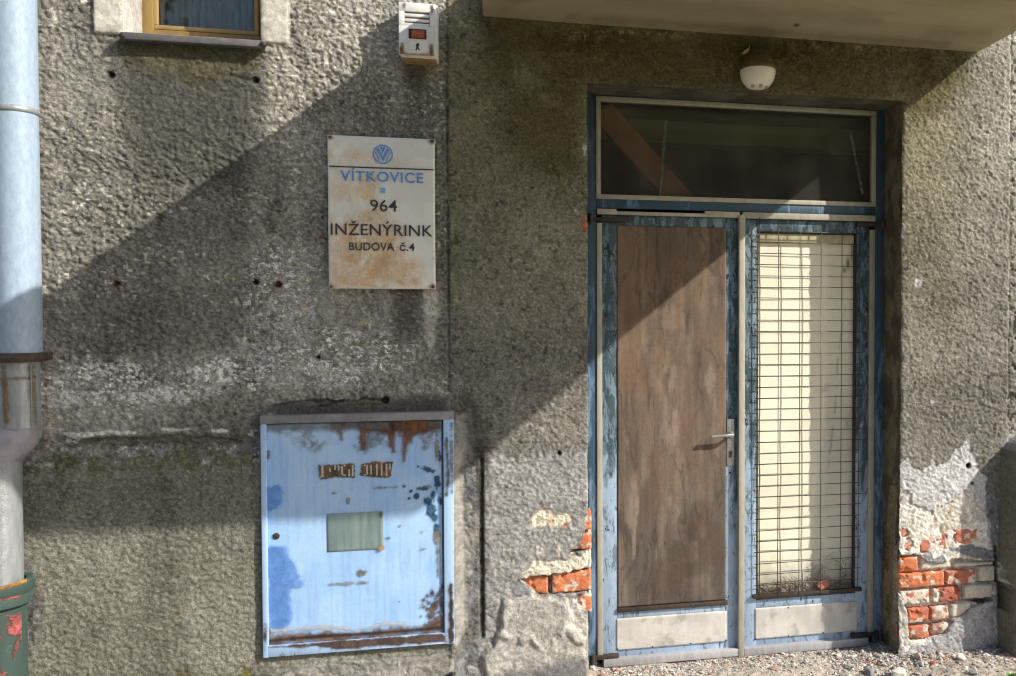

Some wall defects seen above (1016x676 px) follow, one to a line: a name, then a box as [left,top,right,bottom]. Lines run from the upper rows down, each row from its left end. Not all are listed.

leakage [116,43,263,177]
peeling [280,445,608,676]
peeling [882,438,1010,665]